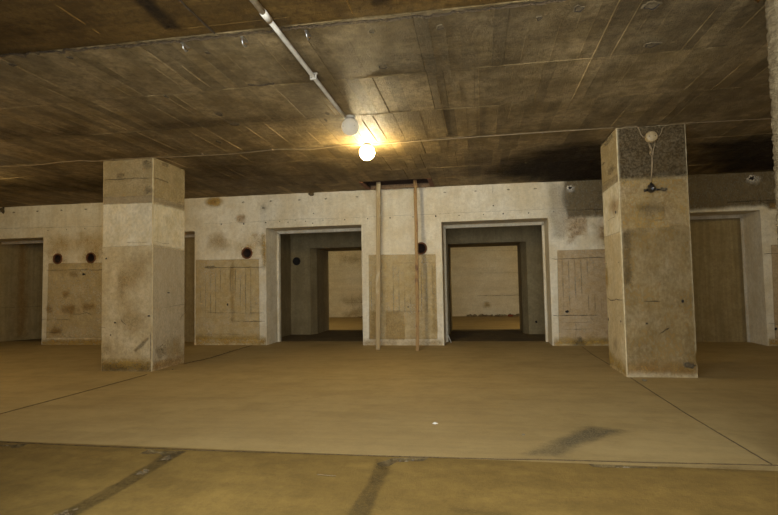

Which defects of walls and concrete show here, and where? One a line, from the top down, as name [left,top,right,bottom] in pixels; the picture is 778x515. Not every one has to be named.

spalling [755,0,778,339]